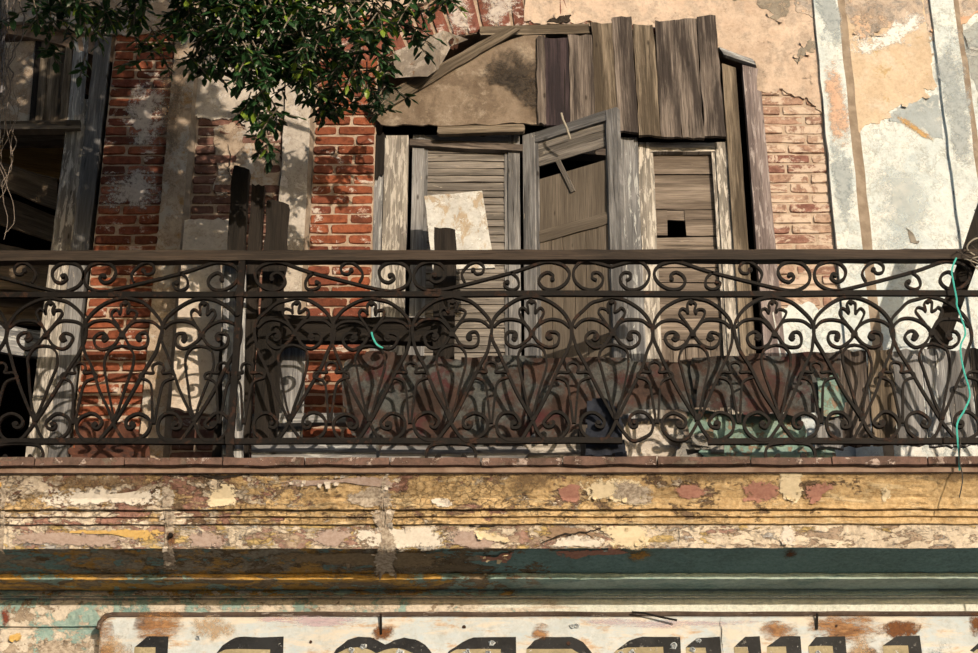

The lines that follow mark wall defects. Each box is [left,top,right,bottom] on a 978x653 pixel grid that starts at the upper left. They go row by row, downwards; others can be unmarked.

water stain [484,50,538,110]
flaking render [93,31,175,250]
peeling [757,0,978,249]
flaking render [777,264,840,310]
flaking render [71,265,154,457]
peeling [207,484,238,507]
peeling [558,477,655,507]
peeling [741,467,833,505]
peeling [8,484,179,576]
flaking render [272,473,514,581]
peeling [546,524,655,559]
corrosion [811,616,921,653]